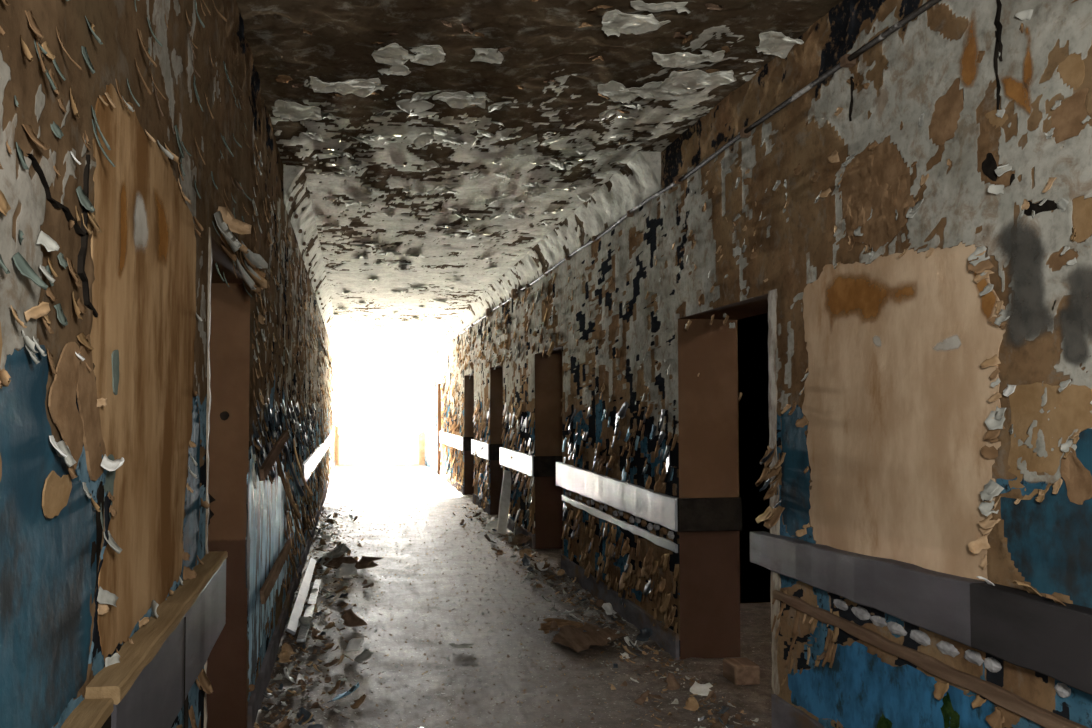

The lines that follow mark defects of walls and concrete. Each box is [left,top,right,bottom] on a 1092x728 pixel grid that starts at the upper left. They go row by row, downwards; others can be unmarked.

peeling [272,33,644,240]
peeling [440,20,512,64]
peeling [579,0,736,129]
peeling [756,31,804,59]
peeling [919,78,964,146]
peeling [1045,54,1091,144]
flaking render [0,0,334,728]
peeling [333,272,458,321]
peeling [439,254,678,534]
flaking render [679,136,1092,608]
peeling [561,503,679,641]
peeling [771,590,1005,728]